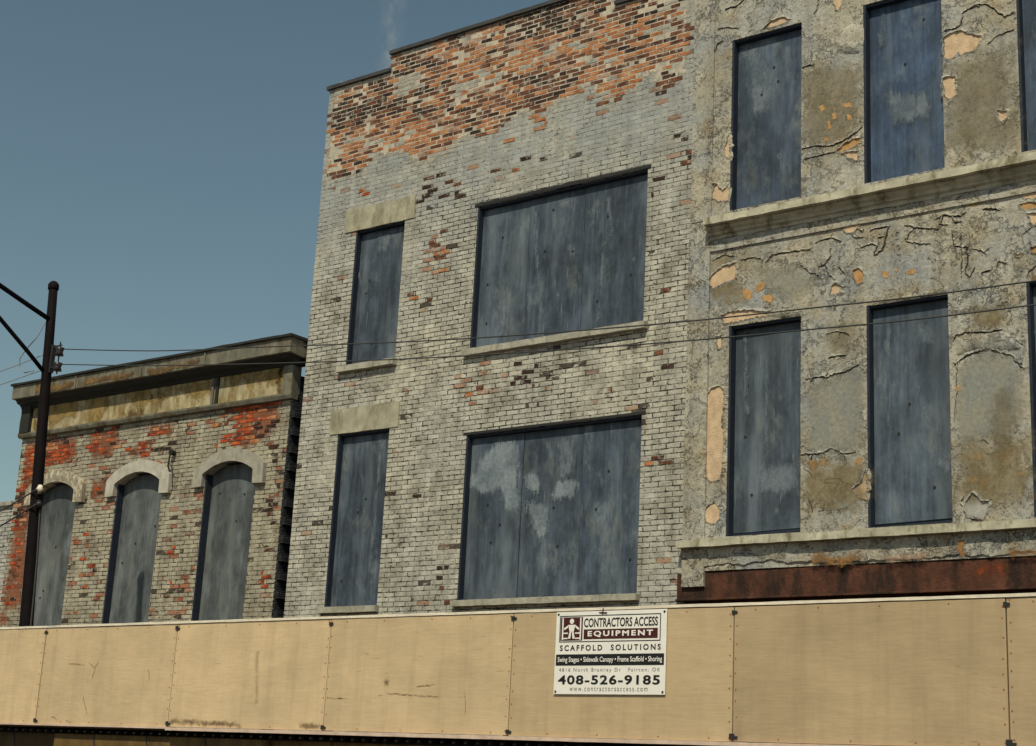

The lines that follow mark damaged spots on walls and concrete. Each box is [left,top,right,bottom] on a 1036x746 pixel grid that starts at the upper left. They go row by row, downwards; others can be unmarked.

peeling [326,0,695,203]
crack [801,126,863,159]
spalling [940,27,984,102]
crack [943,2,1014,44]
crack [714,192,1036,280]
spalling [709,260,775,351]
crack [805,328,859,382]
crack [951,328,1025,422]
peeling [210,401,282,462]
spalling [706,384,727,484]
peeling [4,423,176,610]
corrosion [812,552,861,568]